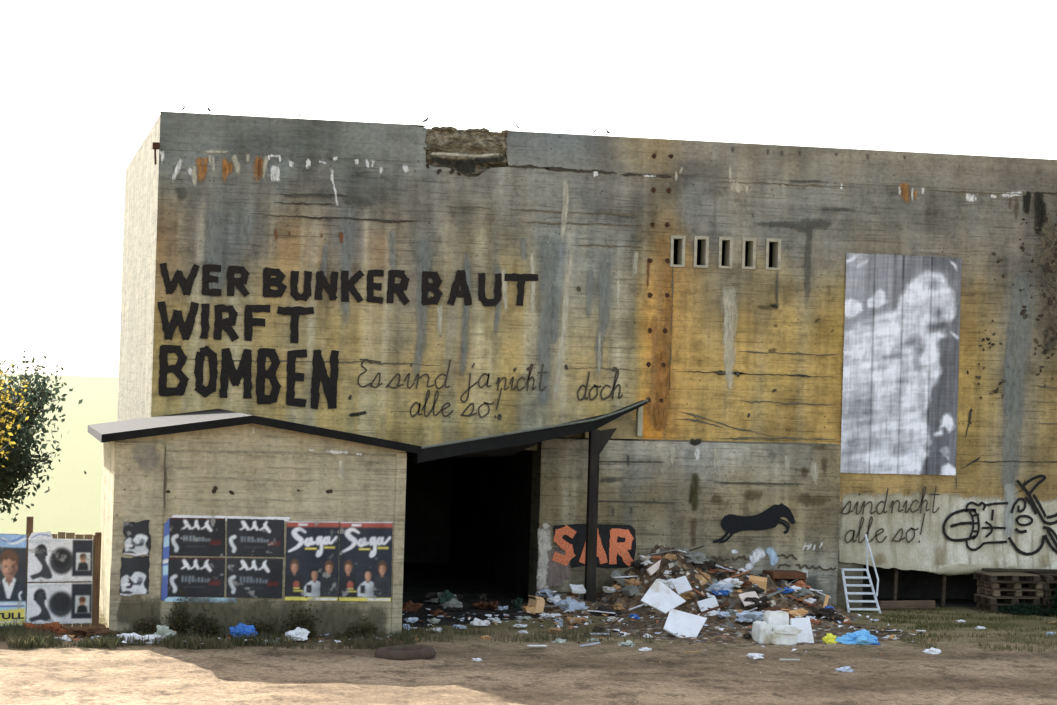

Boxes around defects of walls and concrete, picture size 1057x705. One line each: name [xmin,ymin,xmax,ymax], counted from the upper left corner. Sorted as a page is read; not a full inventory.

rust [196,158,208,181]
rust [222,159,233,181]
rust [253,157,263,178]
spalling [423,126,511,177]
rust [901,183,917,202]
water stain [991,191,1046,234]
water stain [752,208,851,296]
water stain [759,273,779,309]